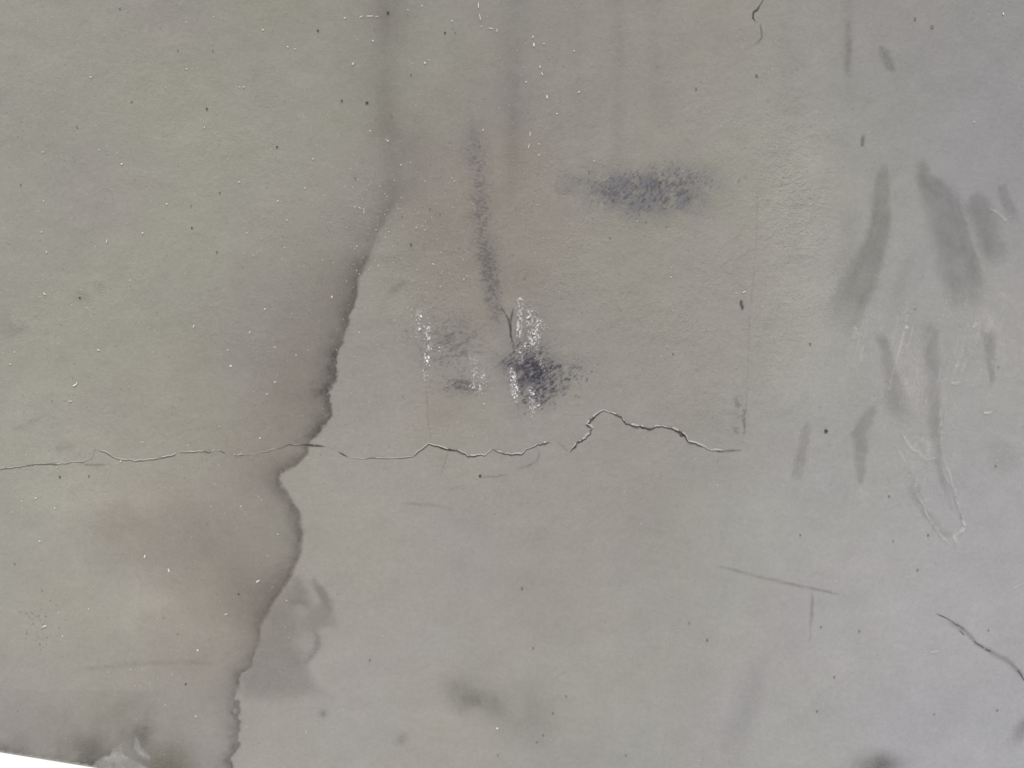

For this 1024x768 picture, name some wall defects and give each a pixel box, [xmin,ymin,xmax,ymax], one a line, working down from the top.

crack [0,409,723,470]